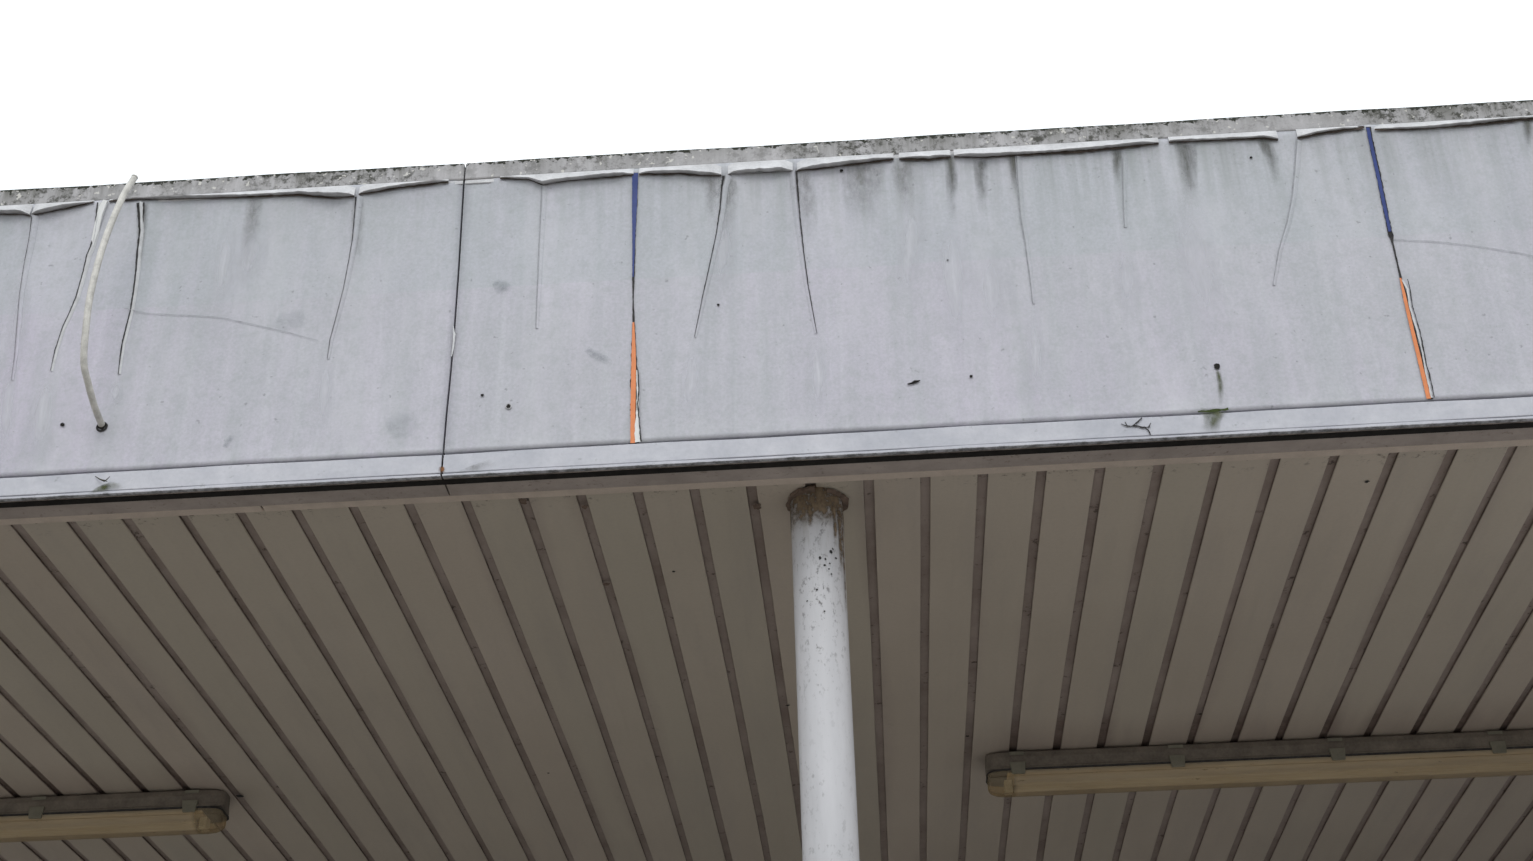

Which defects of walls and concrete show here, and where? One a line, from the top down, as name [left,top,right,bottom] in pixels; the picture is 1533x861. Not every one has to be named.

crack [11,200,145,380]
crack [327,195,364,359]
crack [694,174,732,337]
crack [789,169,817,334]
crack [1015,156,1035,304]
crack [1273,140,1302,286]